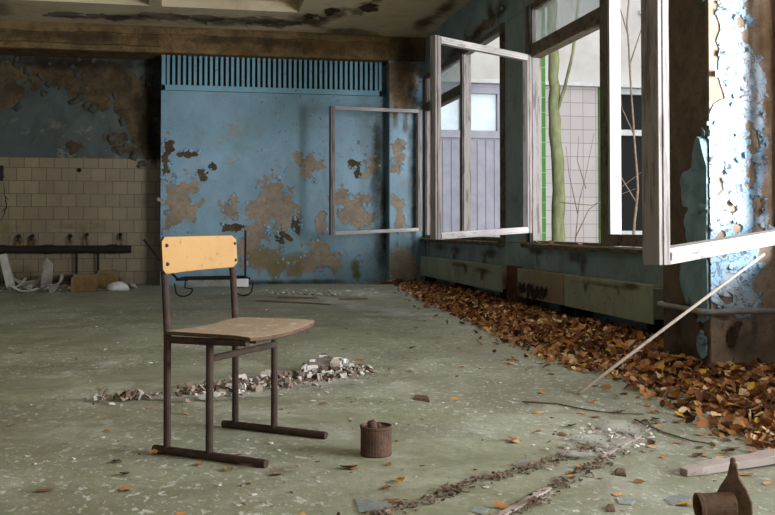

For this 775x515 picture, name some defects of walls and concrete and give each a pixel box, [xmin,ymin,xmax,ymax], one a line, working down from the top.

water stain [256,3,367,26]
peeling [0,56,217,235]
water stain [136,87,160,161]
peeling [292,151,327,184]
peeling [347,138,408,179]
water stain [404,123,416,182]
peeling [680,0,775,243]
peeling [218,171,376,279]
peeling [389,193,422,281]
peeling [679,248,766,359]